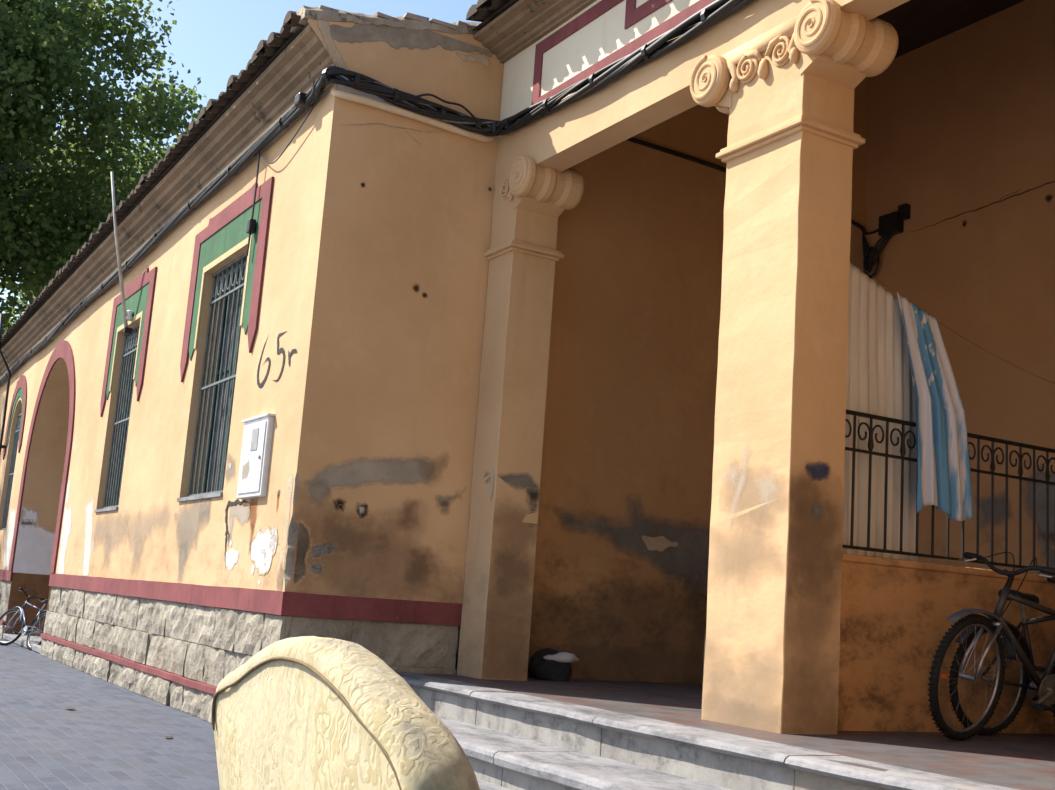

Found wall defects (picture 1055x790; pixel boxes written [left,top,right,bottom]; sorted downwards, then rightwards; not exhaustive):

flaking render [317,19,492,125]
crack [903,181,1055,235]
peeling [0,480,71,575]
flaking render [82,500,95,576]
damp [96,500,210,578]
spalling [225,473,337,591]
damp [562,509,710,600]